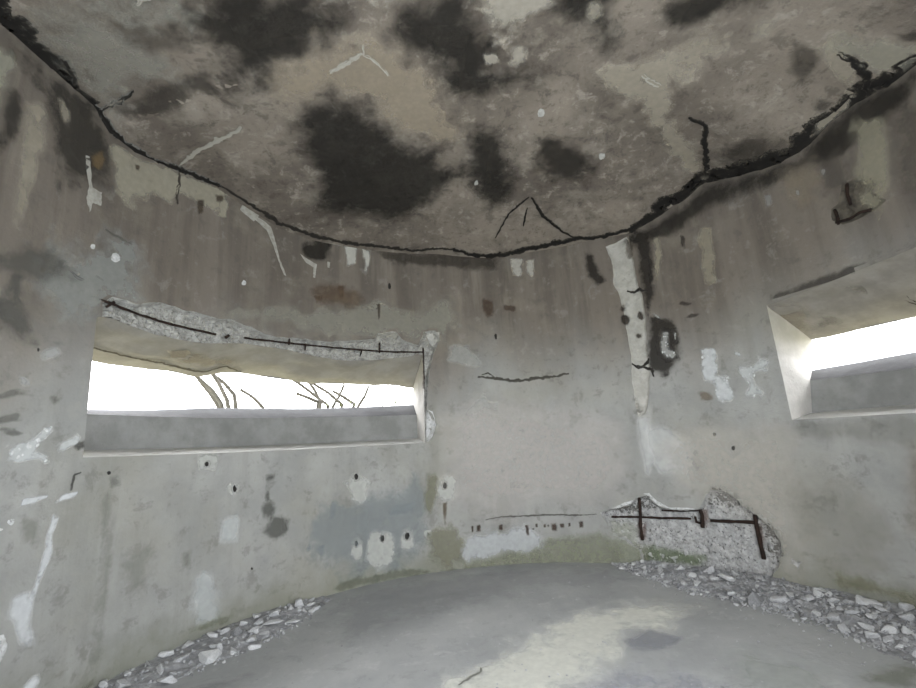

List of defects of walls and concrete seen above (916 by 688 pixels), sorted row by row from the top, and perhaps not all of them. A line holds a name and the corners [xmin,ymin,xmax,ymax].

damp [186,0,455,140]
damp [396,0,514,94]
damp [666,0,734,25]
damp [300,105,511,218]
crack [0,0,916,259]
spalling [831,175,886,225]
spalling [97,297,230,339]
crack [478,372,569,383]
spalling [606,237,659,416]
damp [648,317,679,377]
peeling [701,349,733,400]
spalling [601,488,802,577]